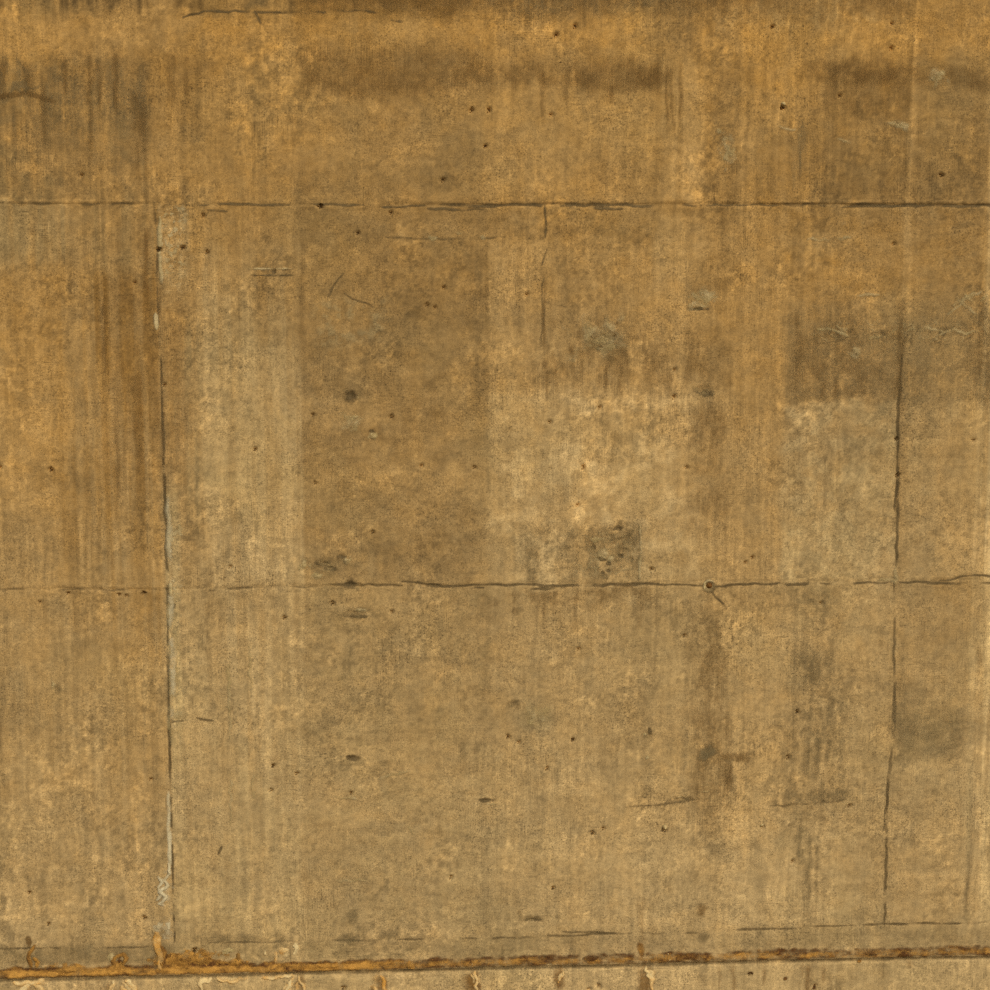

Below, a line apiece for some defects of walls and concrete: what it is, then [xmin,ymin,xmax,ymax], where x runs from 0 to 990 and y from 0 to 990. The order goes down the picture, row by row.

crack [890,621,898,725]
crack [868,763,956,925]
rust [0,937,990,979]